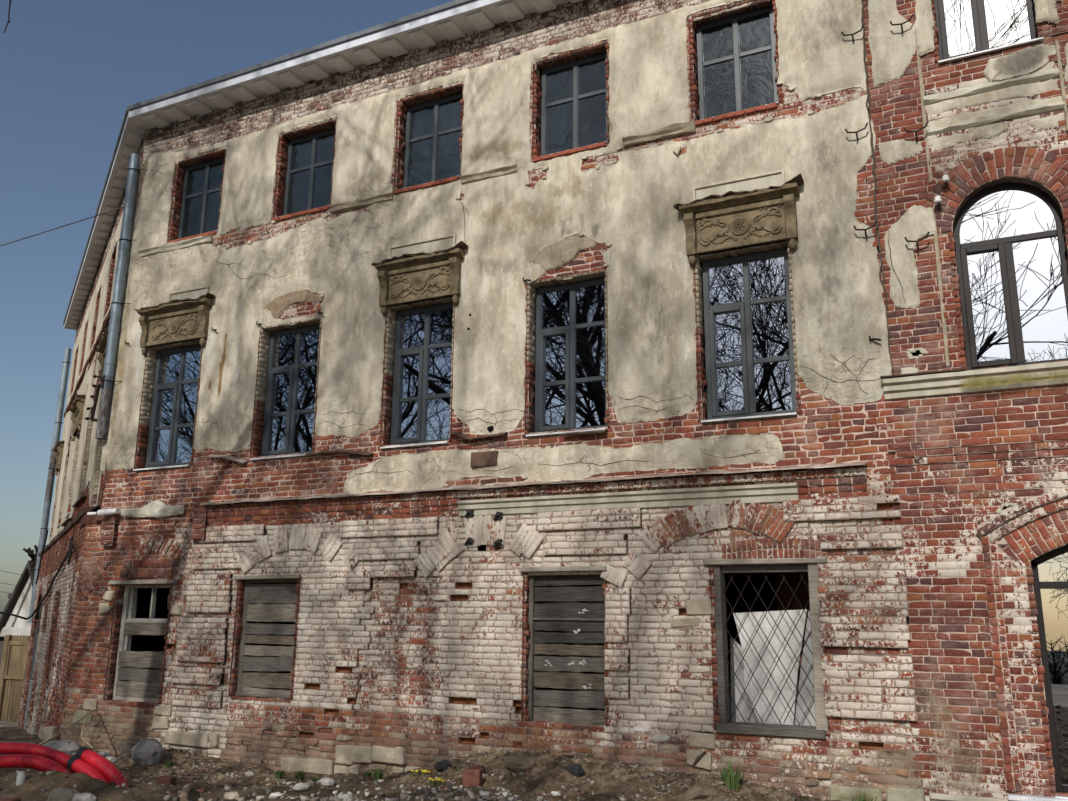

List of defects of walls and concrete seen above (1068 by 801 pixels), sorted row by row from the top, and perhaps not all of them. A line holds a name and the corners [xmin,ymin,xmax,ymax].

spalling [525,160,549,189]
crack [801,0,906,394]
spalling [527,233,612,284]
spalling [907,347,929,360]
rust [208,334,227,395]
crack [618,396,684,413]
crack [459,409,522,425]
spalling [442,474,528,492]
spalling [877,502,900,510]
spalling [450,582,472,601]
spalling [324,698,356,715]
spalling [859,741,906,760]